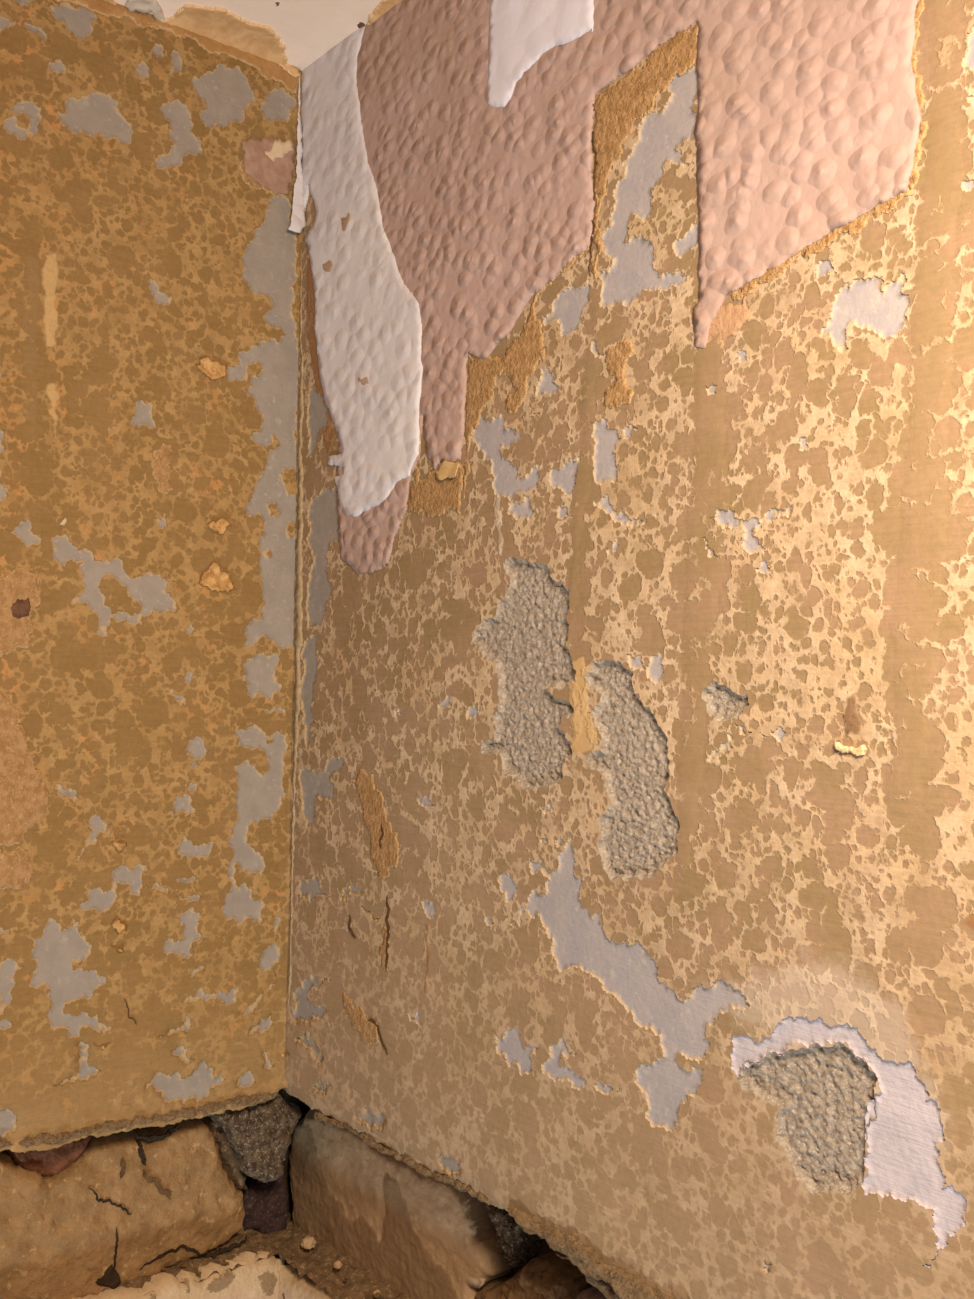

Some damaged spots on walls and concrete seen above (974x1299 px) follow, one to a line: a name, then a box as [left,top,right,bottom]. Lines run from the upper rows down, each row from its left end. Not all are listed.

peeling [0,0,98,42]
peeling [961,7,974,74]
peeling [542,64,699,359]
peeling [814,259,910,357]
peeling [471,367,648,556]
peeling [710,504,792,574]
peeling [0,193,345,1177]
flaking render [436,557,680,882]
flaking render [701,681,786,763]
peeling [484,835,750,1133]
flaking render [728,1016,967,1269]
flaking render [507,1207,674,1299]